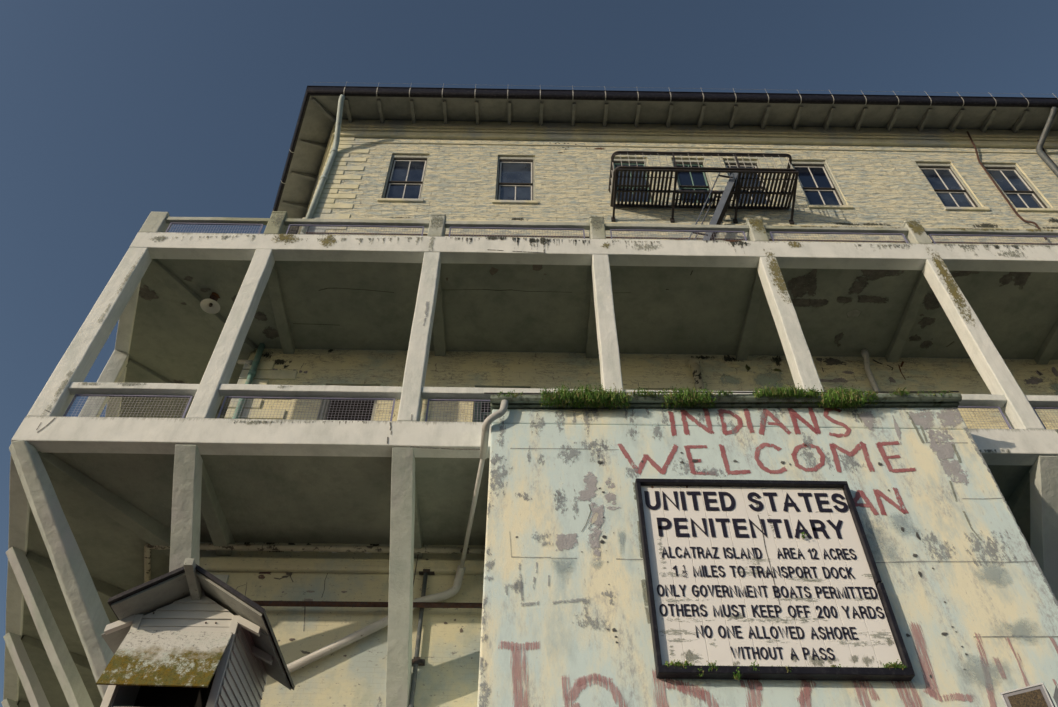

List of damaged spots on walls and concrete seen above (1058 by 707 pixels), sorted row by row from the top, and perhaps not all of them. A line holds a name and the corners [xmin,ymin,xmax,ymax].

peeling [892,407,969,485]
peeling [555,455,620,563]